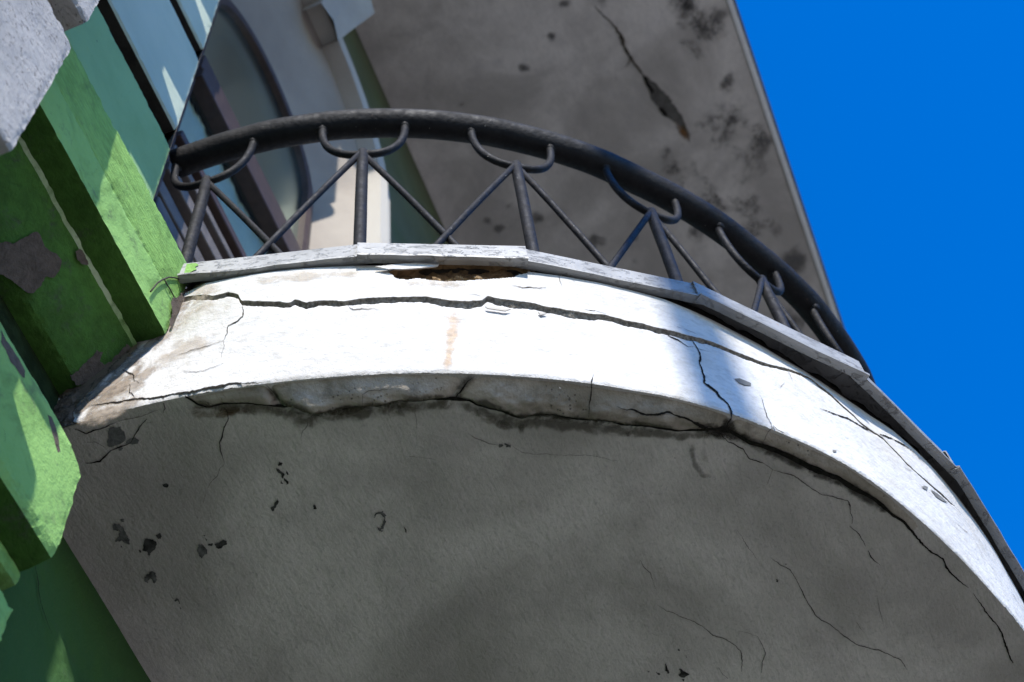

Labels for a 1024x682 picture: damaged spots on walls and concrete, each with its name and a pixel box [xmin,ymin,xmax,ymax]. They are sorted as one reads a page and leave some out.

crack [595,6,643,75]
damp [677,0,725,49]
peeling [0,232,62,293]
spalling [375,262,535,282]
damp [201,391,446,426]
spalling [107,427,139,451]
damp [458,378,885,512]
crack [75,274,1013,666]
peeling [112,519,161,556]
peeling [197,535,227,560]
crack [659,606,766,677]